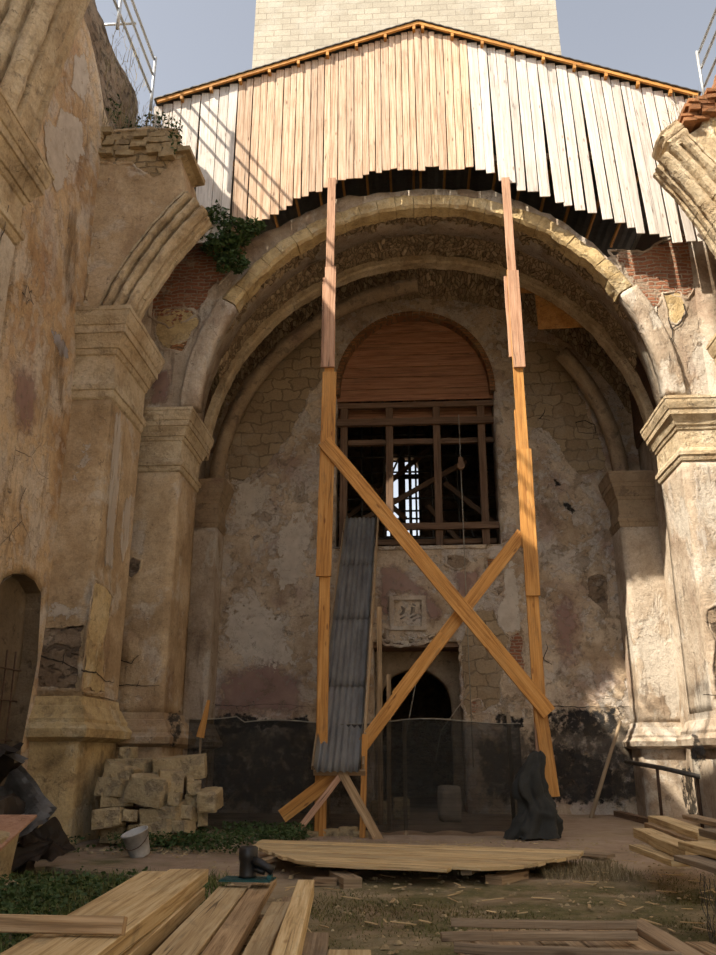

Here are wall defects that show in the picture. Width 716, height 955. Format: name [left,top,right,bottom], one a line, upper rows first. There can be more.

flaking render [147,241,248,354]
flaking render [608,233,699,330]
flaking render [36,578,114,695]
flaking render [702,602,716,697]